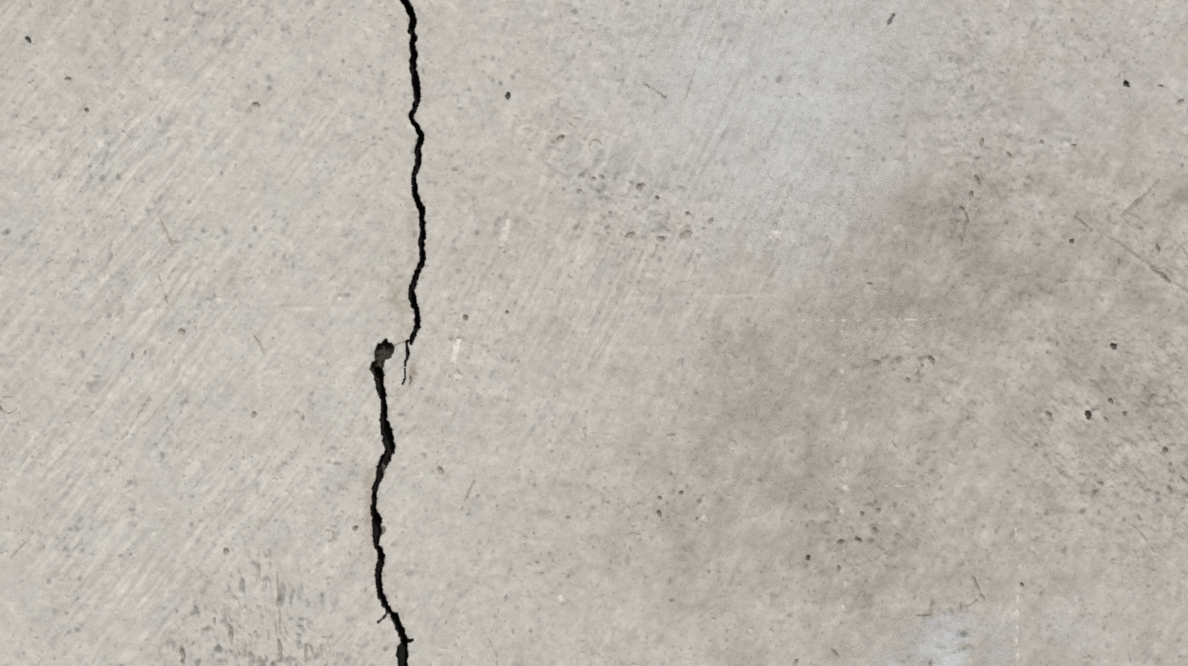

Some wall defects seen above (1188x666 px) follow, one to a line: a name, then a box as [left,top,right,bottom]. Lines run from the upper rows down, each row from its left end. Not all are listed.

crack [369,0,426,666]